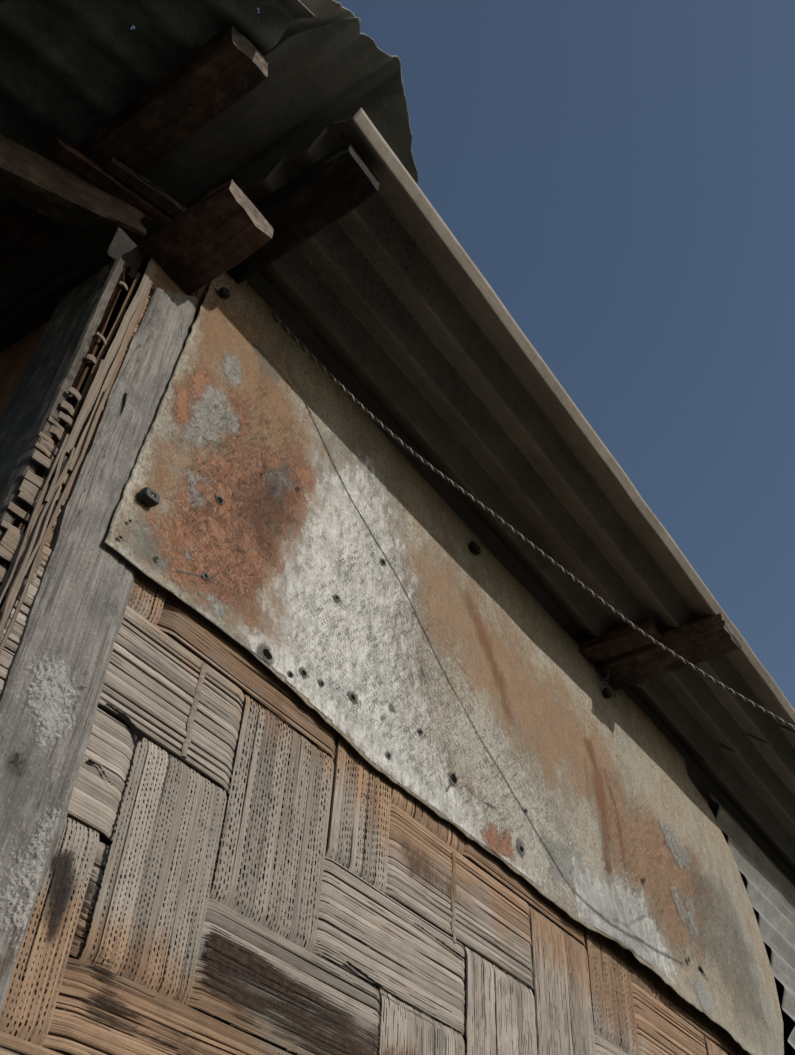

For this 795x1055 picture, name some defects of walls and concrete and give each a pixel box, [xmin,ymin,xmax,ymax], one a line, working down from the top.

corrosion [142,310,317,635]
damp [48,849,101,956]
corrosion [482,821,514,859]
damp [199,925,415,1055]